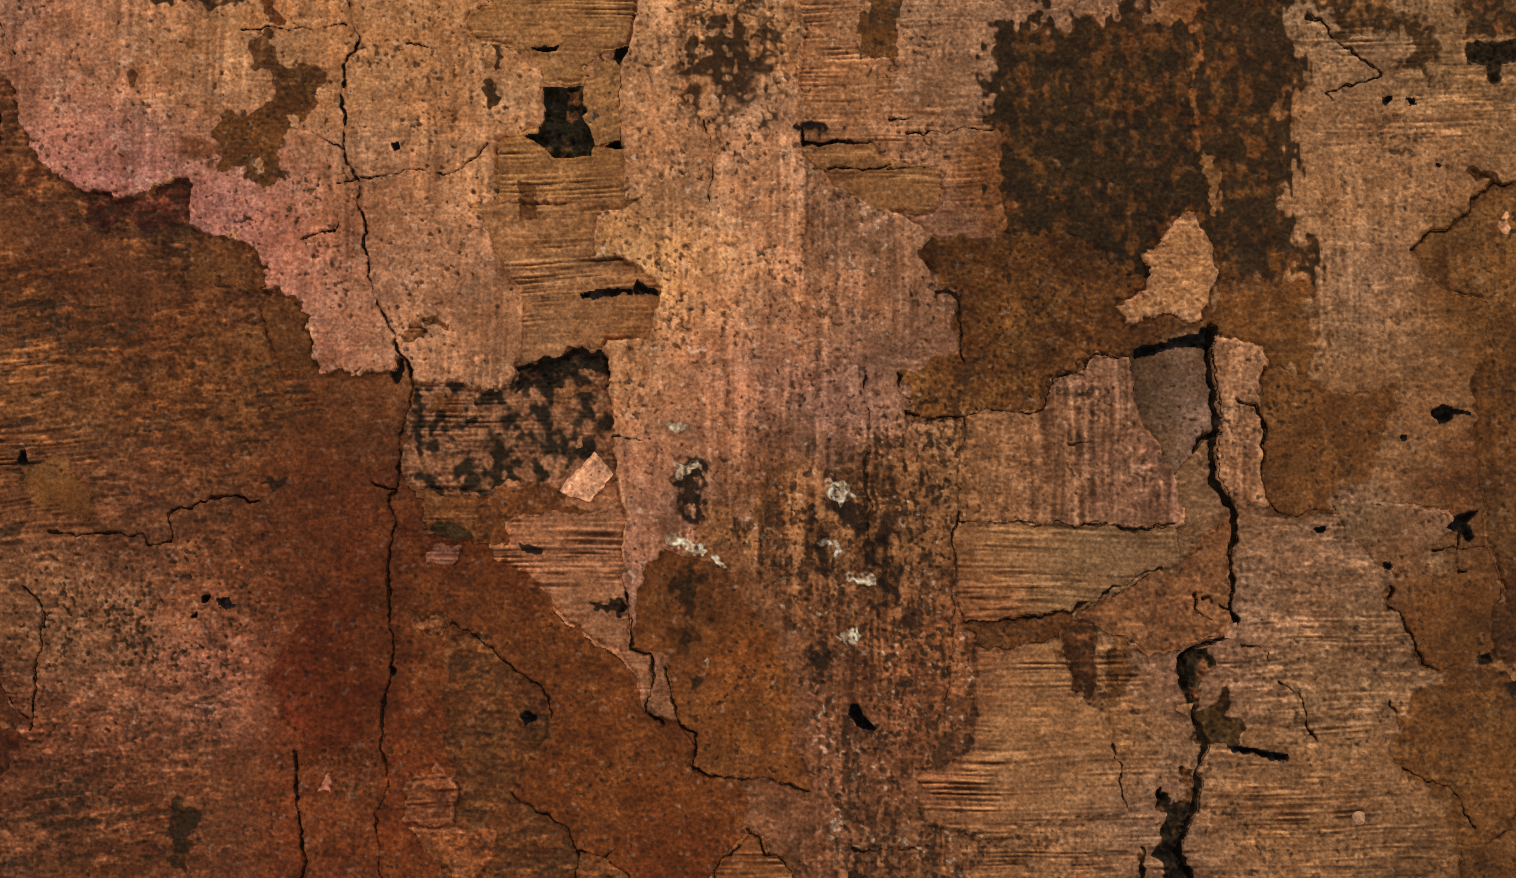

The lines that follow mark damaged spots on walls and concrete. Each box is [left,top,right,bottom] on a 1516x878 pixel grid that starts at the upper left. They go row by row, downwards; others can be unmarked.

water stain [976,0,1442,377]
crack [1410,180,1515,251]
flaking render [0,0,811,878]
flaking render [464,0,1237,838]
crack [863,353,1175,701]
crack [1111,743,1139,841]
spalling [1138,766,1194,878]
spalling [1192,686,1246,746]
crack [1173,323,1336,878]